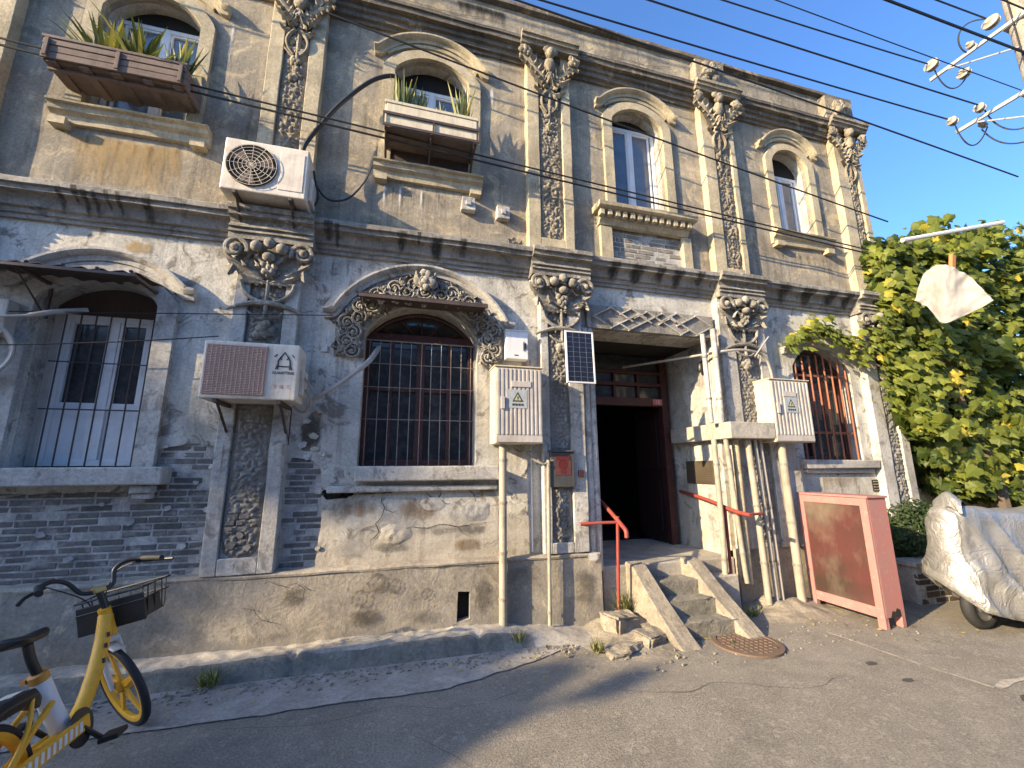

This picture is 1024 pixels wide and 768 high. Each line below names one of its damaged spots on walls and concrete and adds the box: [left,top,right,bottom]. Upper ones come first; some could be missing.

water stain [55,185,124,218]
water stain [141,197,154,224]
flaking render [0,438,215,586]
flaking render [277,408,354,568]
crack [333,485,499,568]